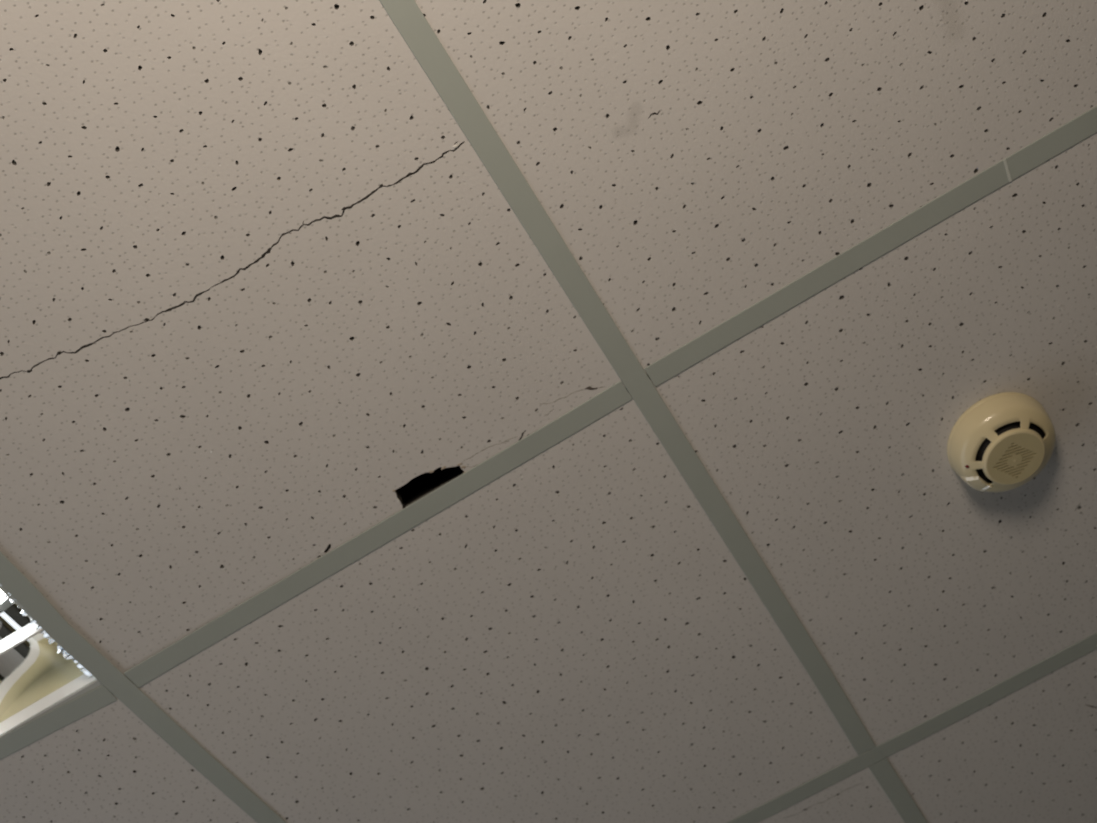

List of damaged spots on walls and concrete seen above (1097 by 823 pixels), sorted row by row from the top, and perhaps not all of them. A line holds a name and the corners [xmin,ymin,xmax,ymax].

crack [0,141,465,379]
spalling [392,463,466,508]